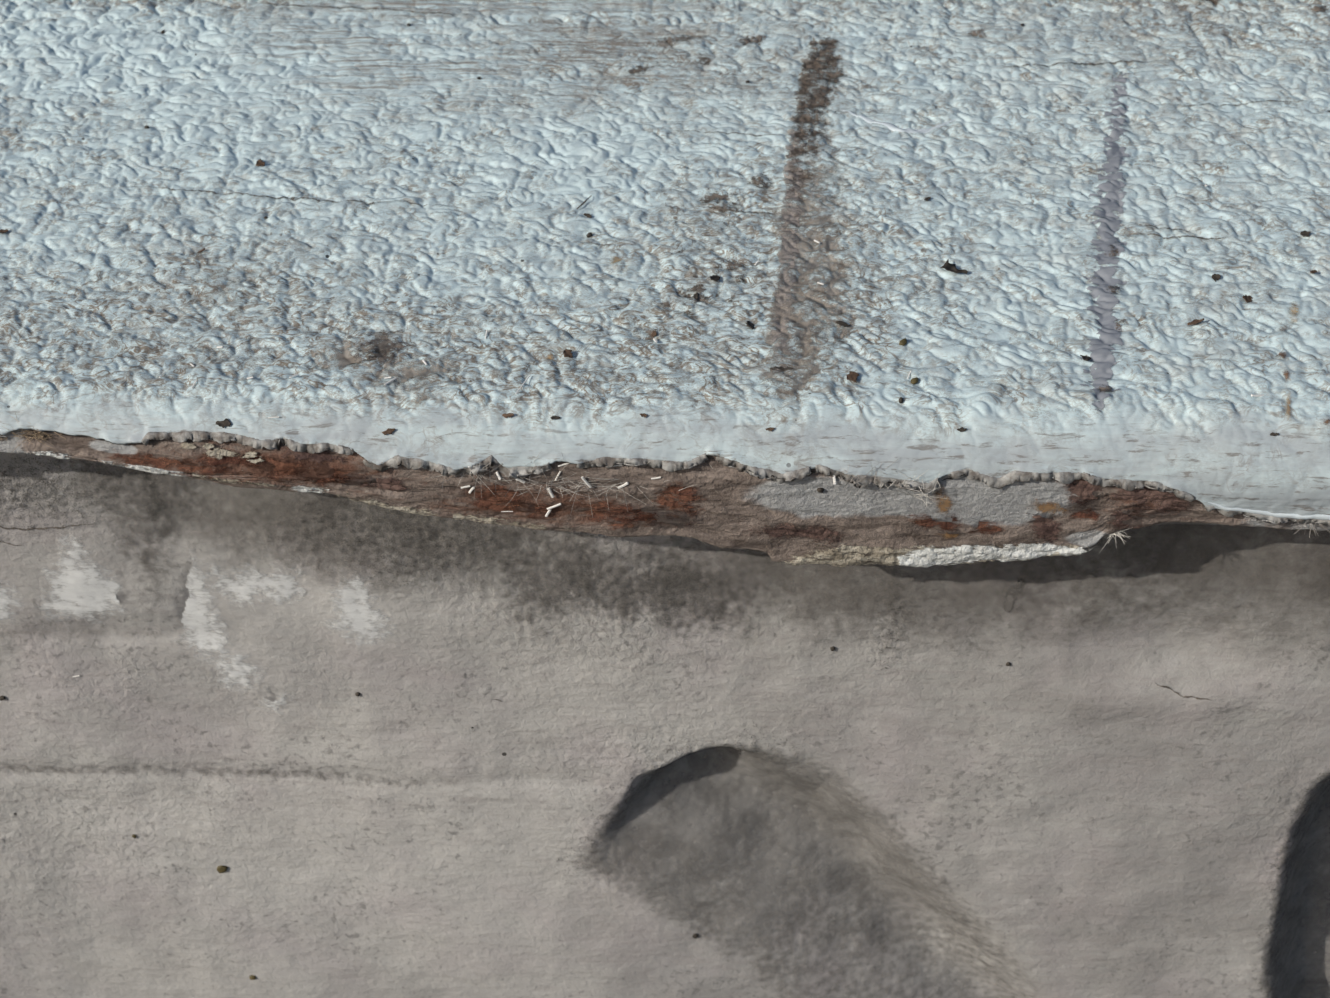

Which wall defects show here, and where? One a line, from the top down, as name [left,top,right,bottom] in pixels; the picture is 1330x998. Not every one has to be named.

damp [761,35,854,400]
damp [0,455,203,622]
damp [181,558,305,688]
damp [215,484,1075,666]
spalling [0,413,1330,567]
damp [1125,524,1330,606]